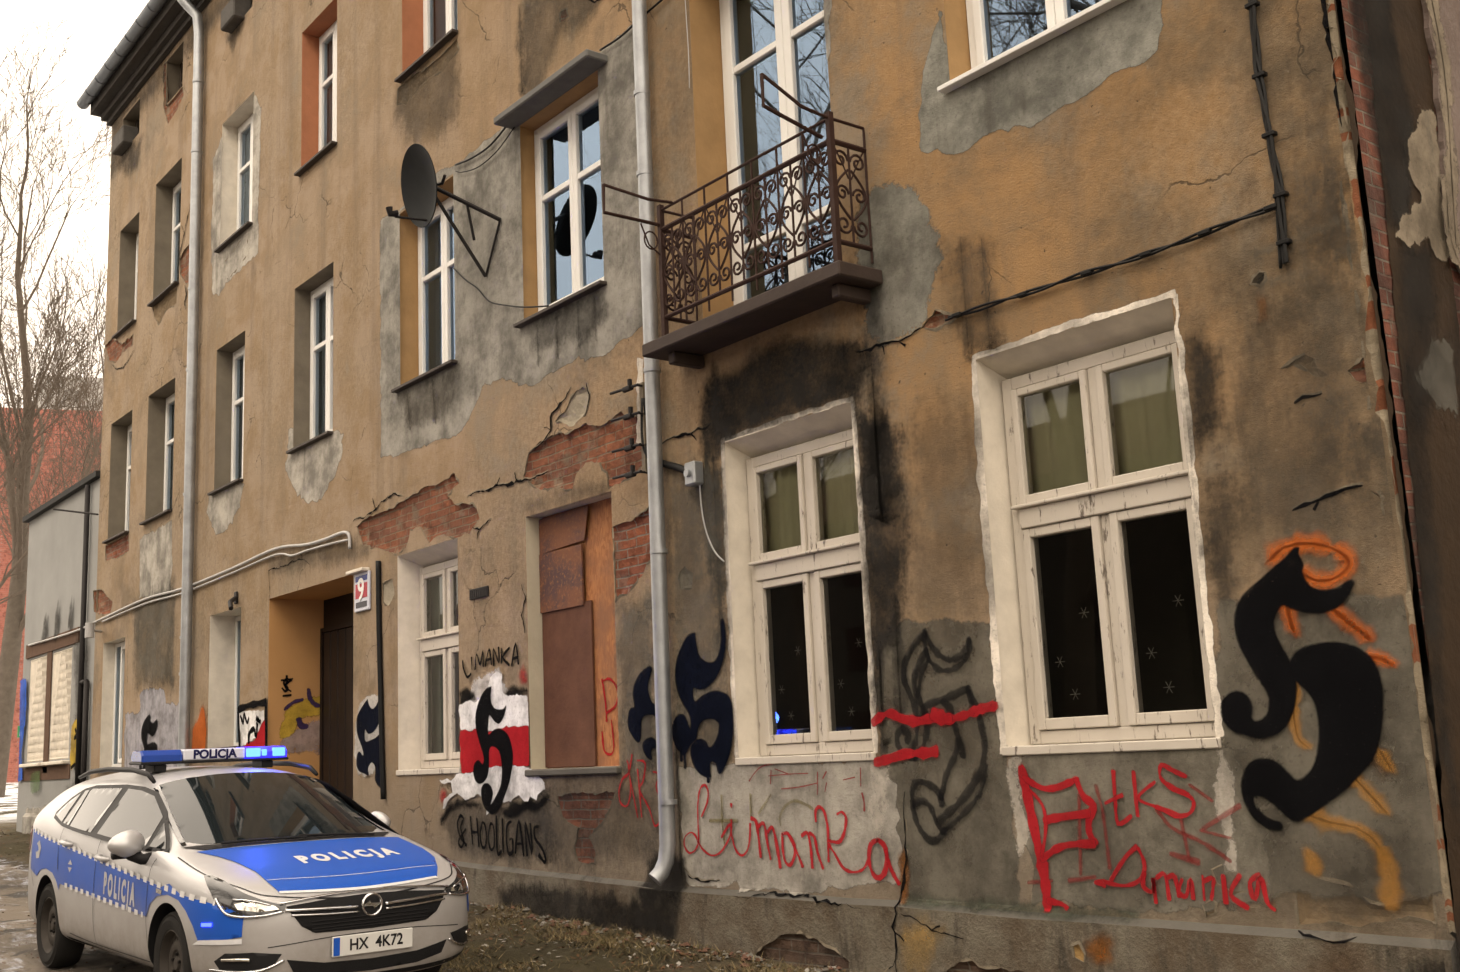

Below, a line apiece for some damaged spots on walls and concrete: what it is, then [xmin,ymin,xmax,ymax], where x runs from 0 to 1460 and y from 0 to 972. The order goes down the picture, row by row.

leakage [522,0,597,94]
spalling [922,309,957,332]
crack [467,383,591,538]
spalling [523,385,642,492]
leakage [669,340,910,747]
crack [679,792,963,972]
spalling [755,930,850,972]